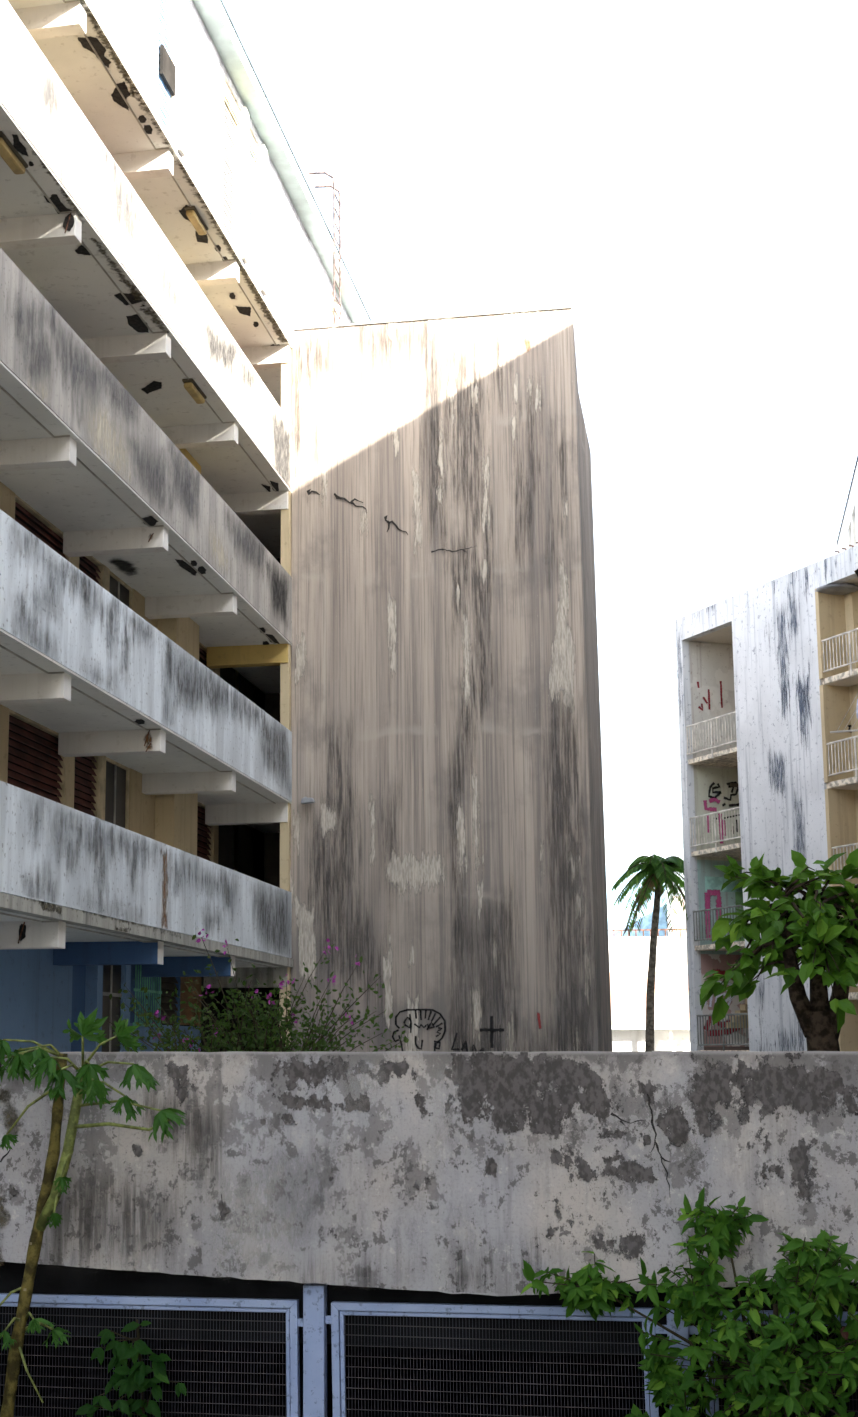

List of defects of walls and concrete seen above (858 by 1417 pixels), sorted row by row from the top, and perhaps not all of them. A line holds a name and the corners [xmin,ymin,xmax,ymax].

damp [206,327,255,387]
damp [272,327,336,484]
damp [362,310,556,553]
crack [307,489,475,553]
damp [387,593,398,676]
damp [449,442,595,1052]
damp [256,741,419,1051]
damp [0,1089,21,1139]
peeling [159,1058,194,1106]
peeling [260,1052,858,1261]
crack [610,1094,670,1194]
damp [58,1179,161,1257]